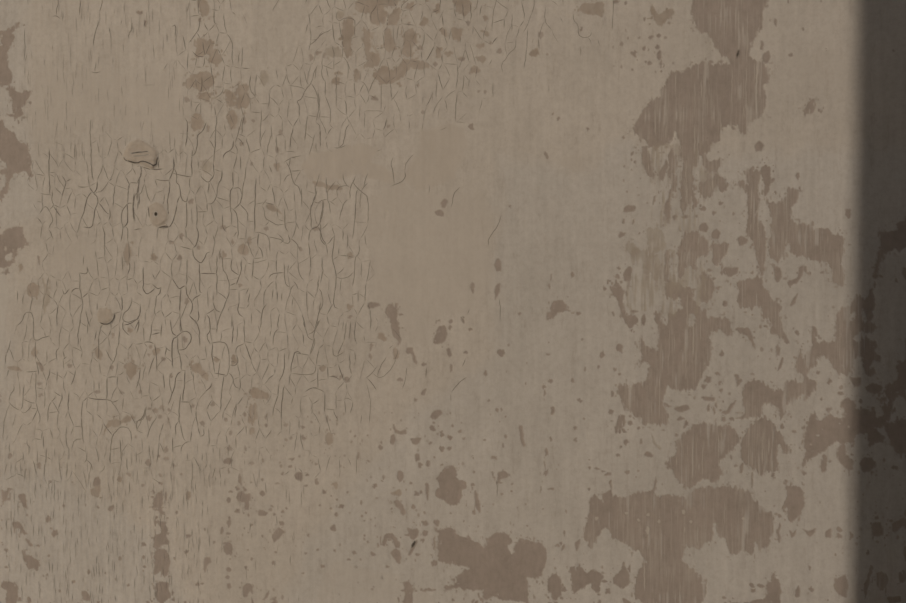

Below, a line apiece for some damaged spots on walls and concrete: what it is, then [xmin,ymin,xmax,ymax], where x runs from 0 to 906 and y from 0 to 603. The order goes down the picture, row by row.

peeling [0,21,35,203]
peeling [0,221,33,275]
crack [0,0,614,603]
peeling [379,0,906,603]
peeling [0,575,24,603]
peeling [0,486,43,576]